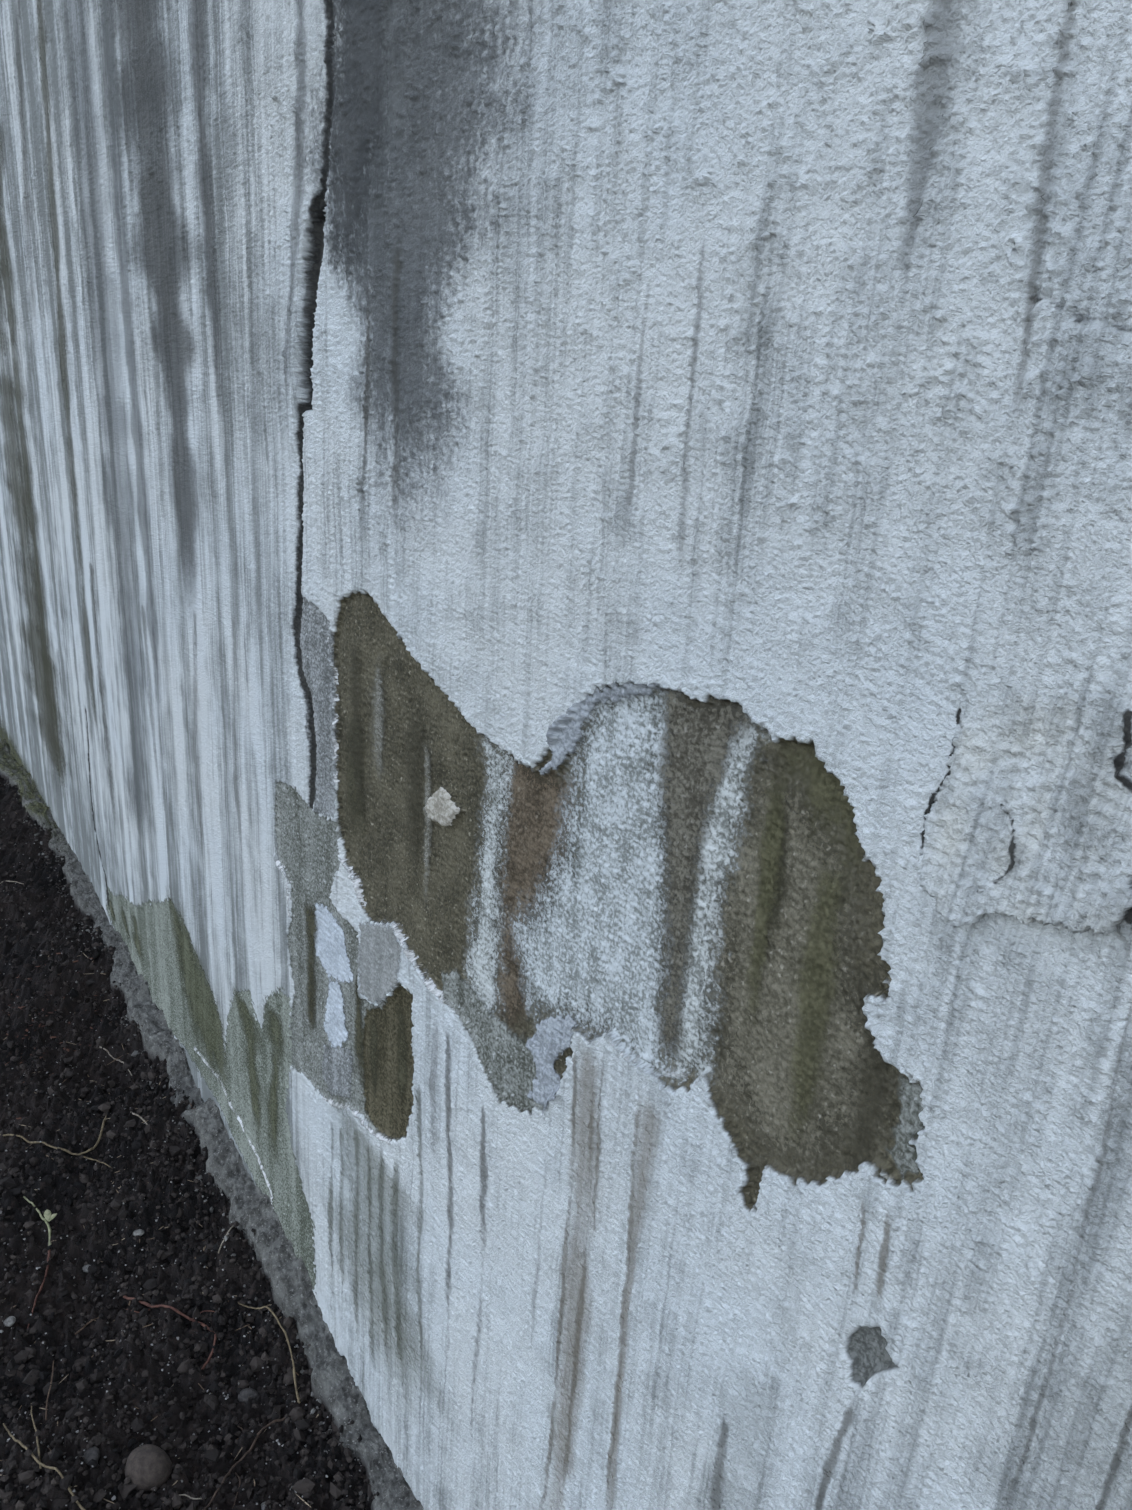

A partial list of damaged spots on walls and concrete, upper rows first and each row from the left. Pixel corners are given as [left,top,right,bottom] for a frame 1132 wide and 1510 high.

leakage [0,137,63,776]
leakage [37,0,95,716]
leakage [116,0,220,573]
crack [292,0,335,809]
leakage [309,0,519,494]
spalling [106,592,925,1290]
spalling [847,1326,898,1387]